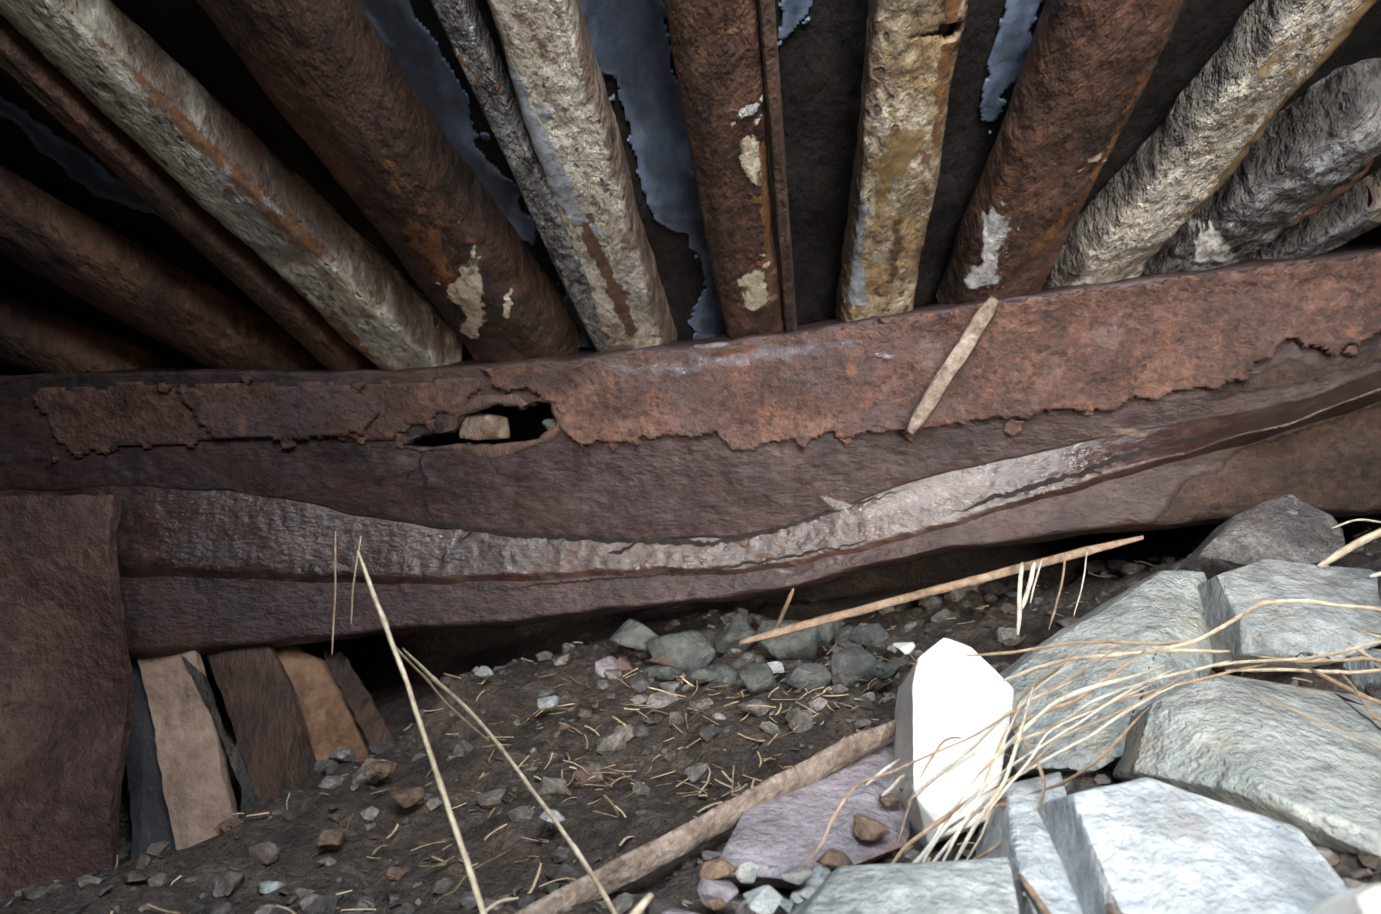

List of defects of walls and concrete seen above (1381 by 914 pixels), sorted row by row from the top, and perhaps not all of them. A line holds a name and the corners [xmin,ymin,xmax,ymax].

rust [119,59,336,276]
rust [379,158,460,287]
rust [749,141,775,289]
rust [871,42,956,211]
rust [1029,26,1170,258]
rust [32,213,1381,462]